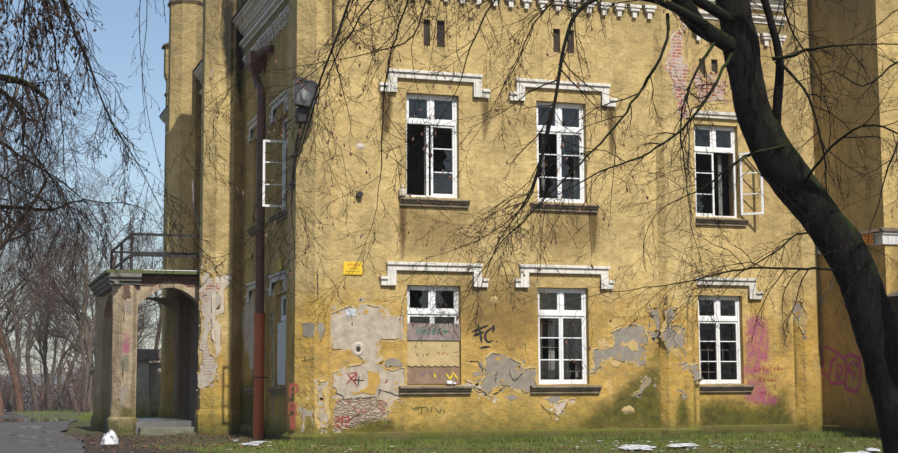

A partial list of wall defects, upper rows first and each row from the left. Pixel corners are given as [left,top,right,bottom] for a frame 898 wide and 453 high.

damp [222,0,244,100]
flaking render [661,17,730,128]
spalling [196,266,233,398]
spalling [299,296,419,434]
peeling [461,351,538,403]
peeling [545,395,576,420]
peeling [584,295,703,398]